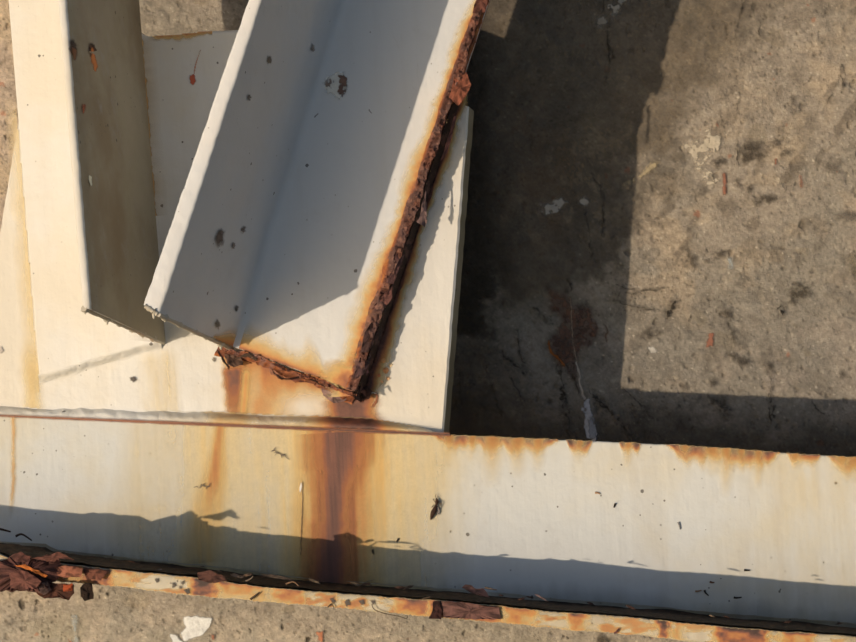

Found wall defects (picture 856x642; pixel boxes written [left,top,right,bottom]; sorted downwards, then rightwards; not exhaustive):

corrosion [142,31,212,155]
leakage [449,0,856,457]
corrosion [154,0,592,631]
corrosion [548,291,608,379]
corrosion [620,442,641,452]
corrosion [667,444,856,472]
peeling [0,552,107,601]
corrosion [57,564,153,587]
corrosion [599,618,817,642]